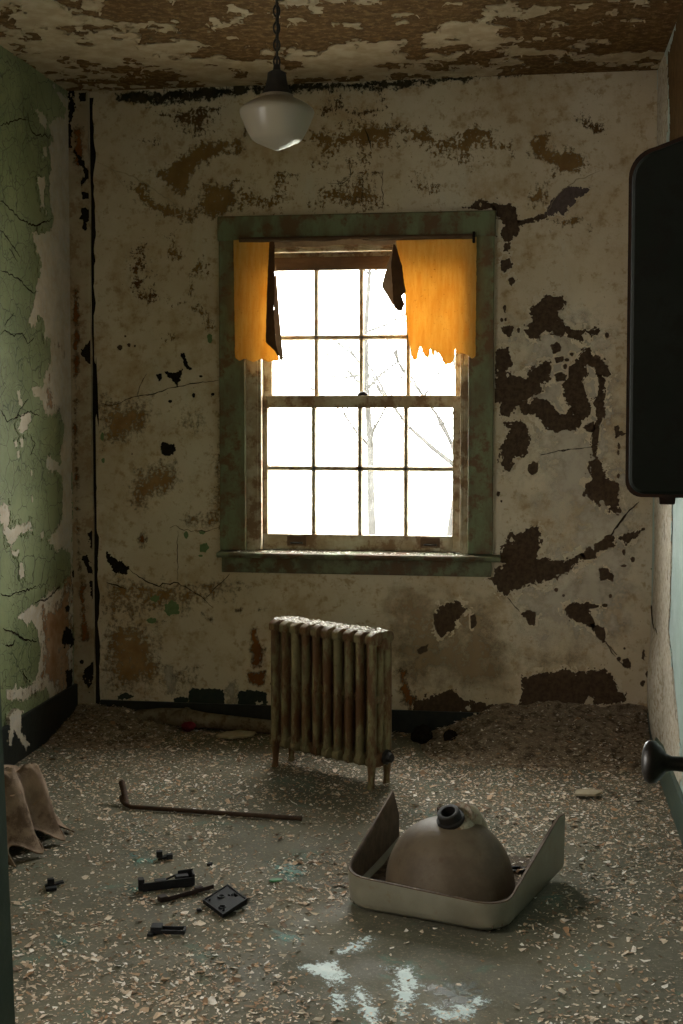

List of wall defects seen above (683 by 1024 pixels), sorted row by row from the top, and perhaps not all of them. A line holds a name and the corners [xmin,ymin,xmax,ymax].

damp [115,85,265,108]
damp [288,77,480,95]
damp [124,128,299,224]
peeling [0,0,683,756]
crack [1,399,39,454]
damp [99,395,154,443]
damp [130,459,177,510]
crack [1,581,64,603]
crack [3,628,36,647]
damp [100,574,241,693]